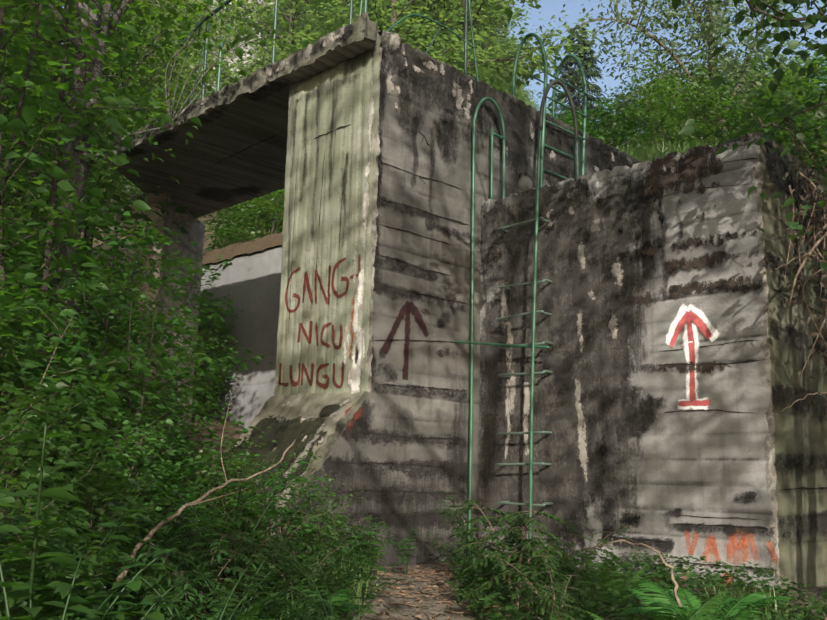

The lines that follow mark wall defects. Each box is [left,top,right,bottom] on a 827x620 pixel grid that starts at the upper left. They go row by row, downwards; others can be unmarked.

crack [313,124,350,292]
peeling [645,133,751,196]
water stain [286,36,827,569]